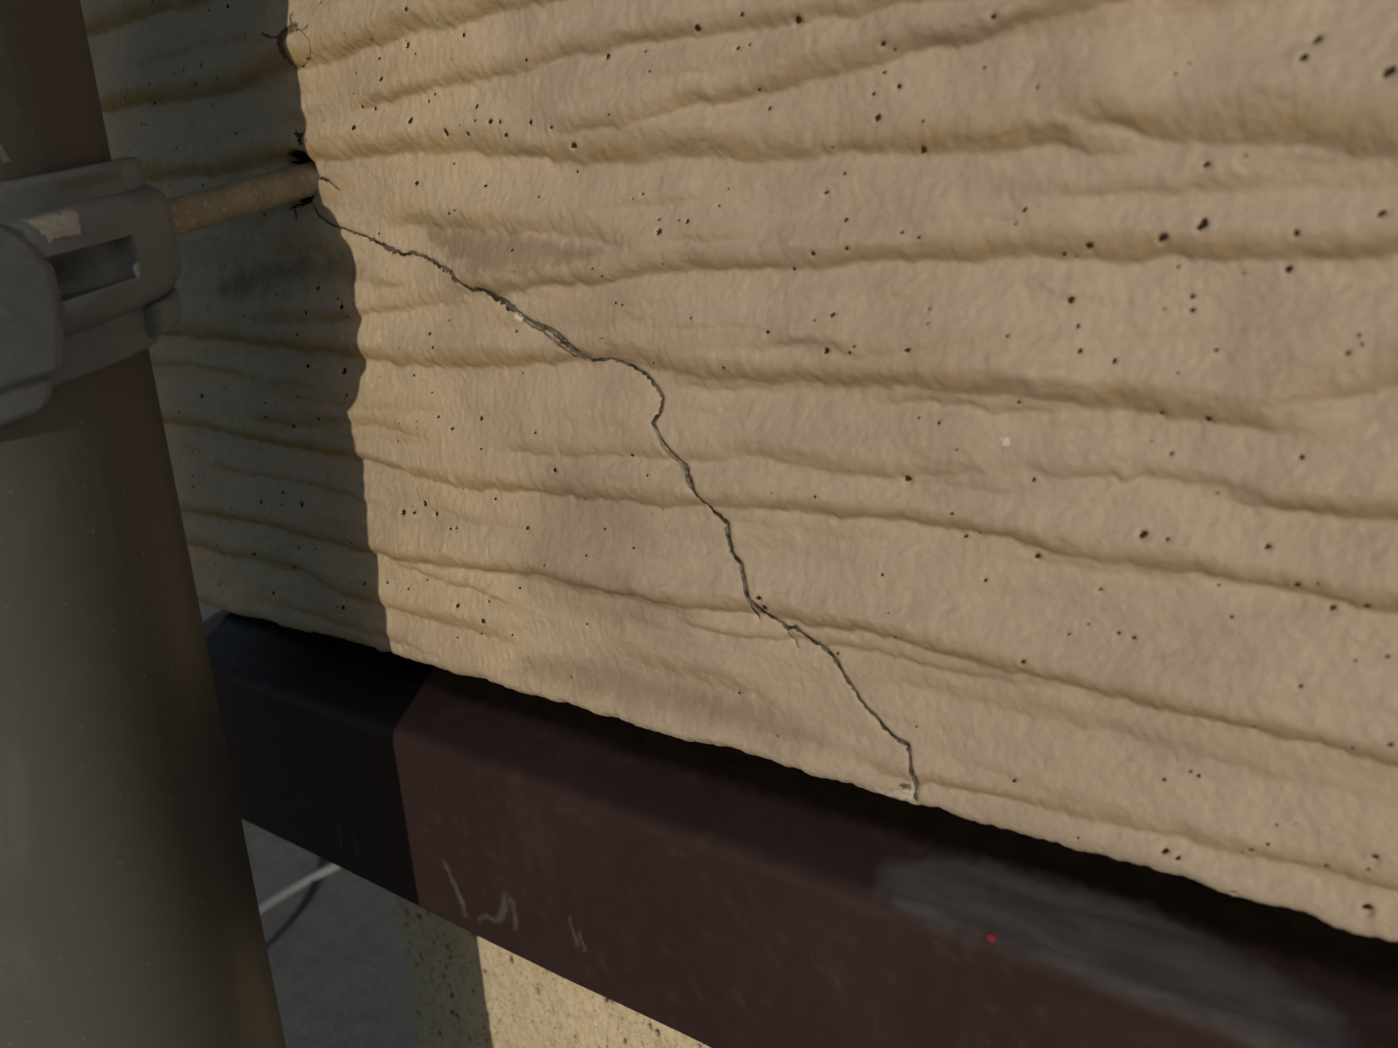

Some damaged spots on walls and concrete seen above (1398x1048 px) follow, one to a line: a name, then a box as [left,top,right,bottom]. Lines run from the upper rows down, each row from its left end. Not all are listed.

crack [311,204,919,801]